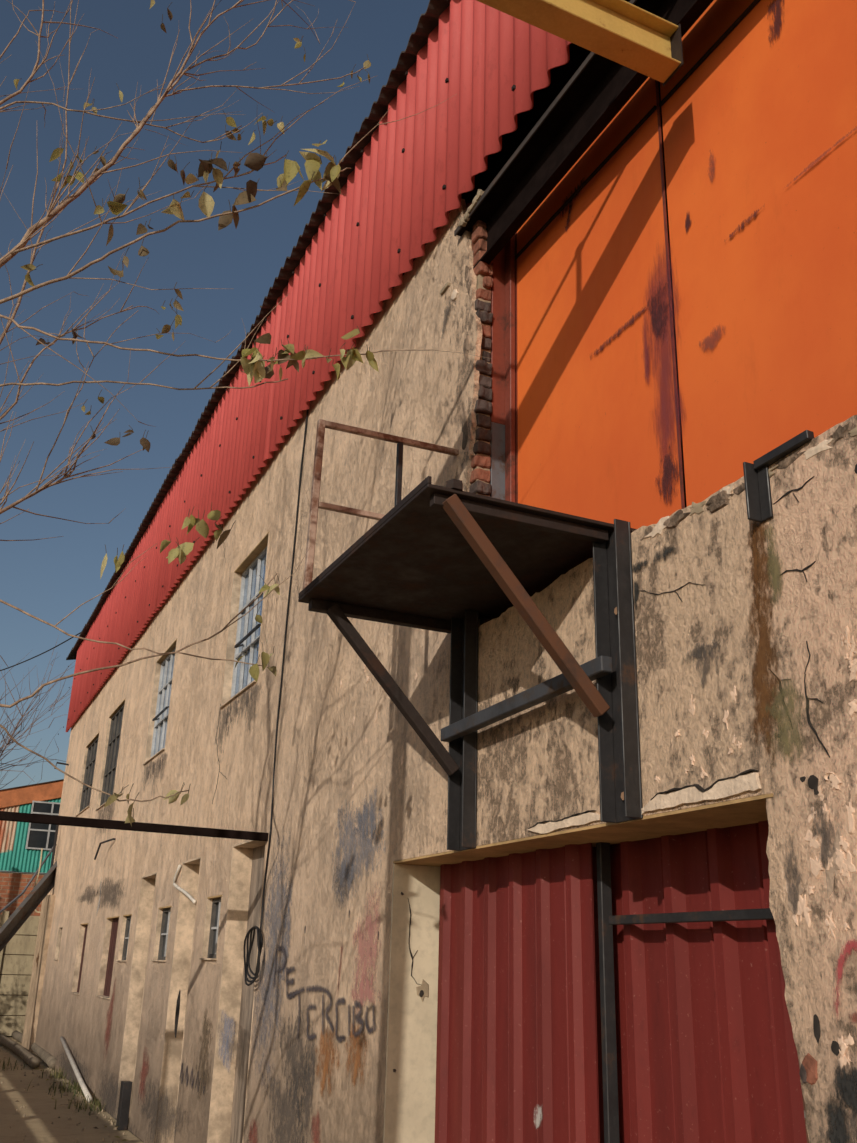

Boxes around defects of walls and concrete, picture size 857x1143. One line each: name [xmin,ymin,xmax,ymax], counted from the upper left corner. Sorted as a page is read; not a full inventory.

spalling [440,220,493,497]
leakage [687,639,718,687]
peeling [722,685,742,755]
crack [768,641,830,758]
spalling [641,755,762,816]
spalling [527,810,600,834]
peeling [786,772,857,938]
spalling [799,1014,857,1085]